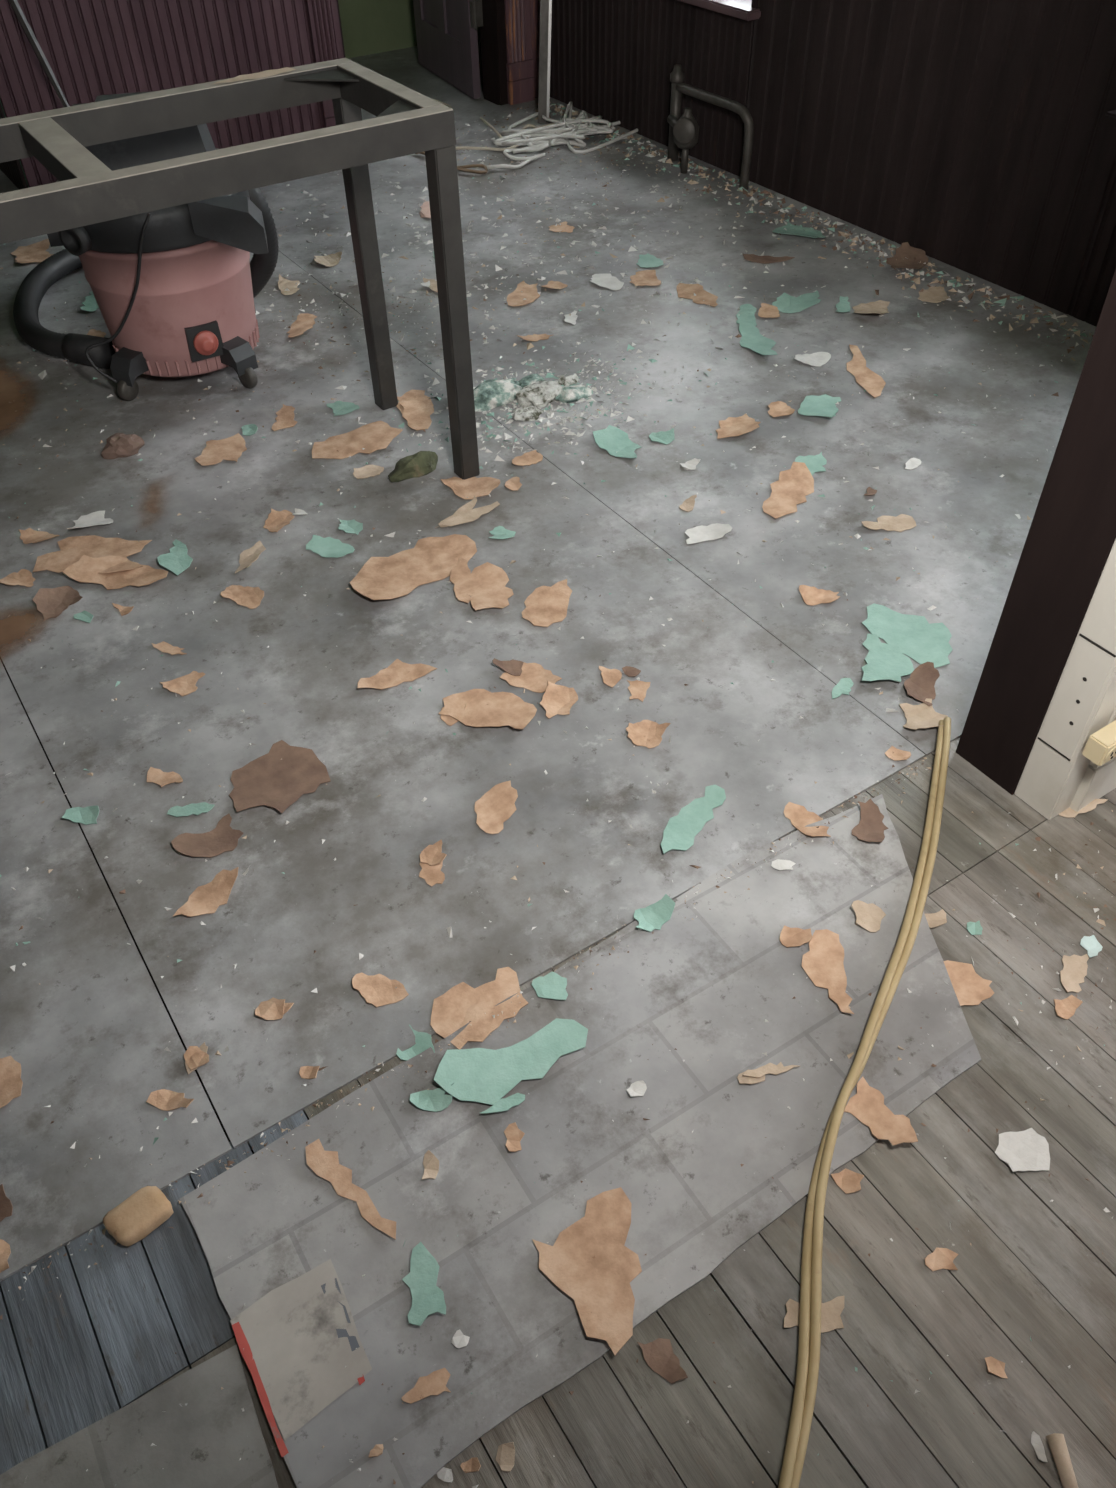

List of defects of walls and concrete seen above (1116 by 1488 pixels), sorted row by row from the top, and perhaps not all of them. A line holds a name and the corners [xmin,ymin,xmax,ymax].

peeling [146,1089,194,1111]
peeling [844,1077,918,1145]
peeling [0,1184,13,1222]
peeling [305,1139,396,1240]
peeling [402,1242,446,1326]
peeling [532,1187,688,1384]